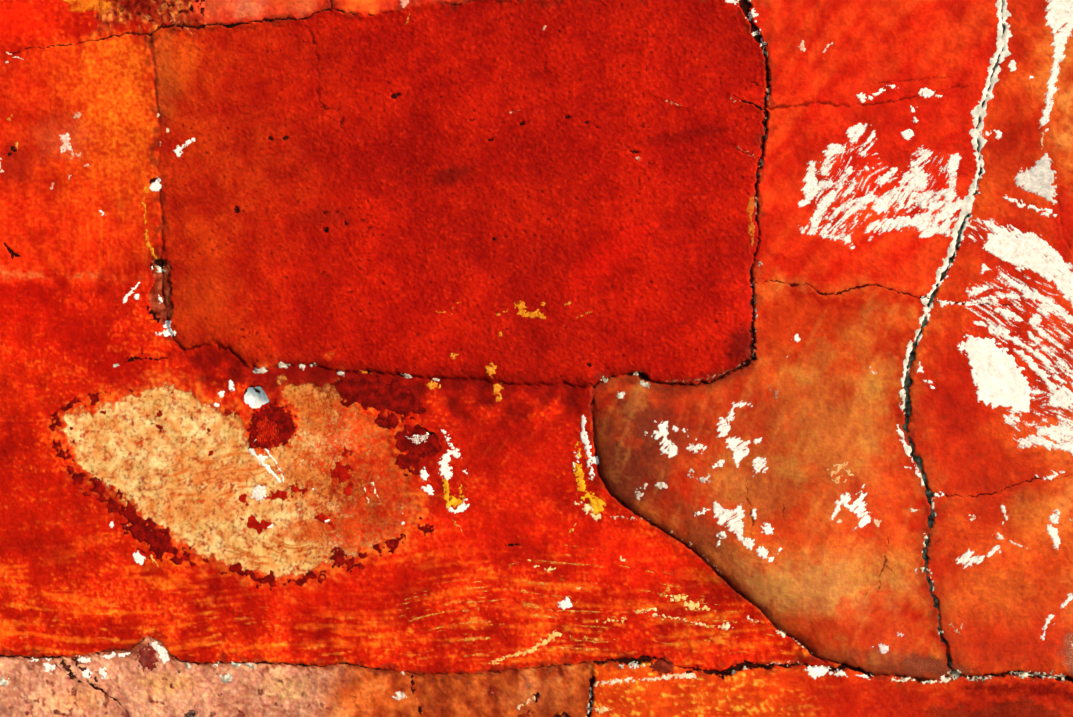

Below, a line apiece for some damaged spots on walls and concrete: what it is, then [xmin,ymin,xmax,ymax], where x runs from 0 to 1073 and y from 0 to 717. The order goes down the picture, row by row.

crack [2,0,392,63]
peeling [846,123,877,156]
peeling [963,218,1073,322]
crack [177,343,530,402]
crack [488,0,1073,717]
peeling [49,370,451,590]
peeling [672,425,706,454]
peeling [717,400,752,438]
peeling [752,457,768,477]
peeling [741,509,782,562]
peeling [472,555,737,665]
crack [0,637,467,714]